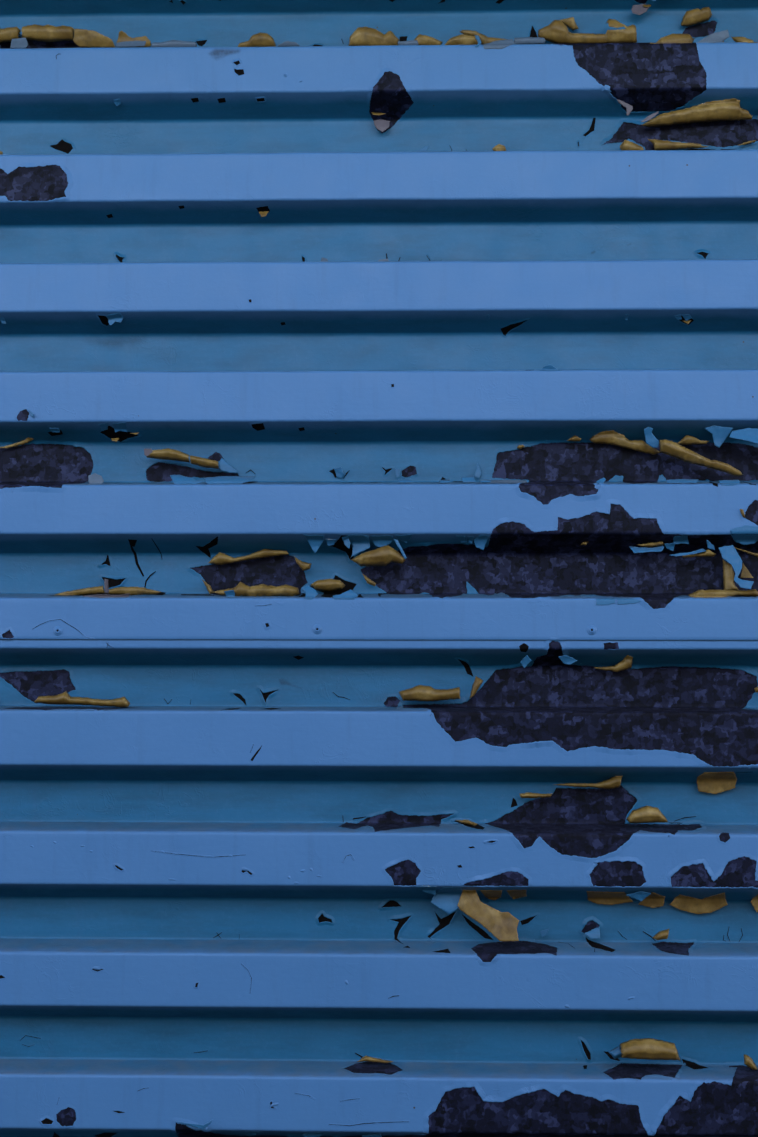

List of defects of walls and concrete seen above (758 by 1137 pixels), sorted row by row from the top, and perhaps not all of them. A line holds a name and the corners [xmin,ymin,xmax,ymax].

peeling [0,24,146,49]
peeling [366,68,417,136]
peeling [460,0,758,150]
peeling [0,161,74,205]
peeling [0,428,104,493]
peeling [98,423,259,484]
peeling [180,425,758,630]
peeling [0,666,140,713]
peeling [381,637,758,769]
peeling [335,776,758,967]
peeling [39,1096,79,1129]
peeling [170,1054,758,1137]